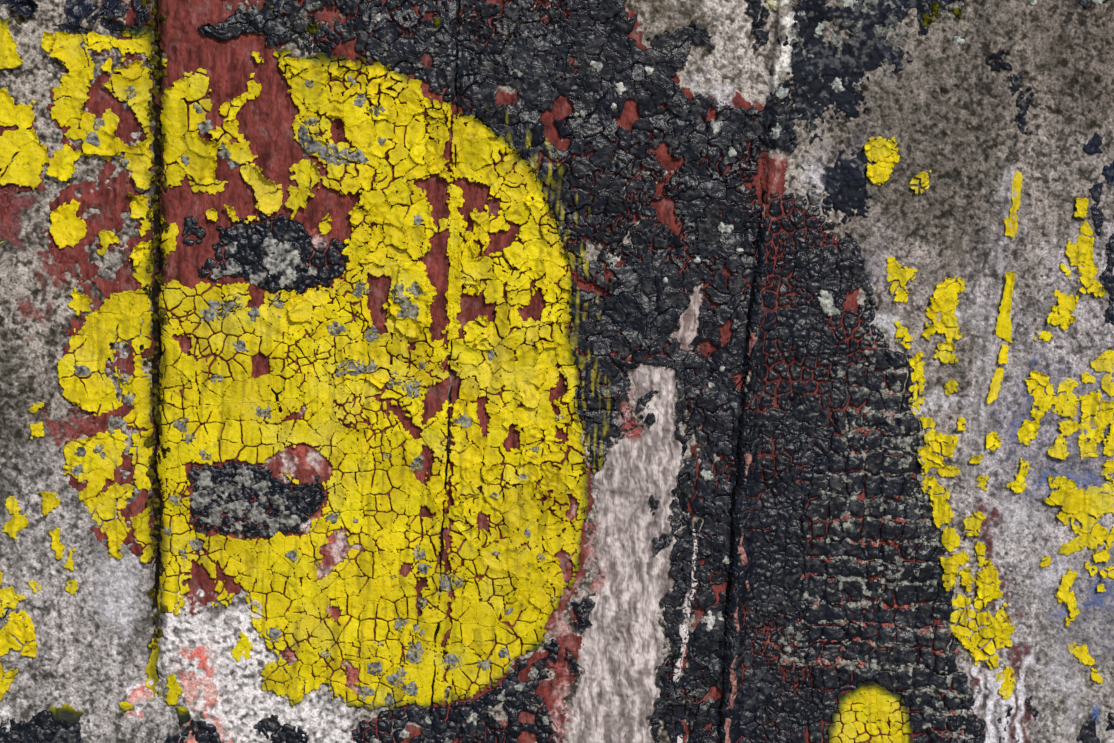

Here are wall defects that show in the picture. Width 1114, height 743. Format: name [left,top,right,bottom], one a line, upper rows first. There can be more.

crack [453,0,461,116]
spalling [0,0,159,571]
crack [150,0,166,697]
crack [267,385,283,413]
crack [430,340,453,727]
crack [570,269,612,295]
crack [716,193,765,743]
peeling [922,276,966,364]
peeling [987,271,1015,405]
peeling [1006,350,1114,626]
peeling [1034,133,1114,342]
peeling [0,572,83,743]